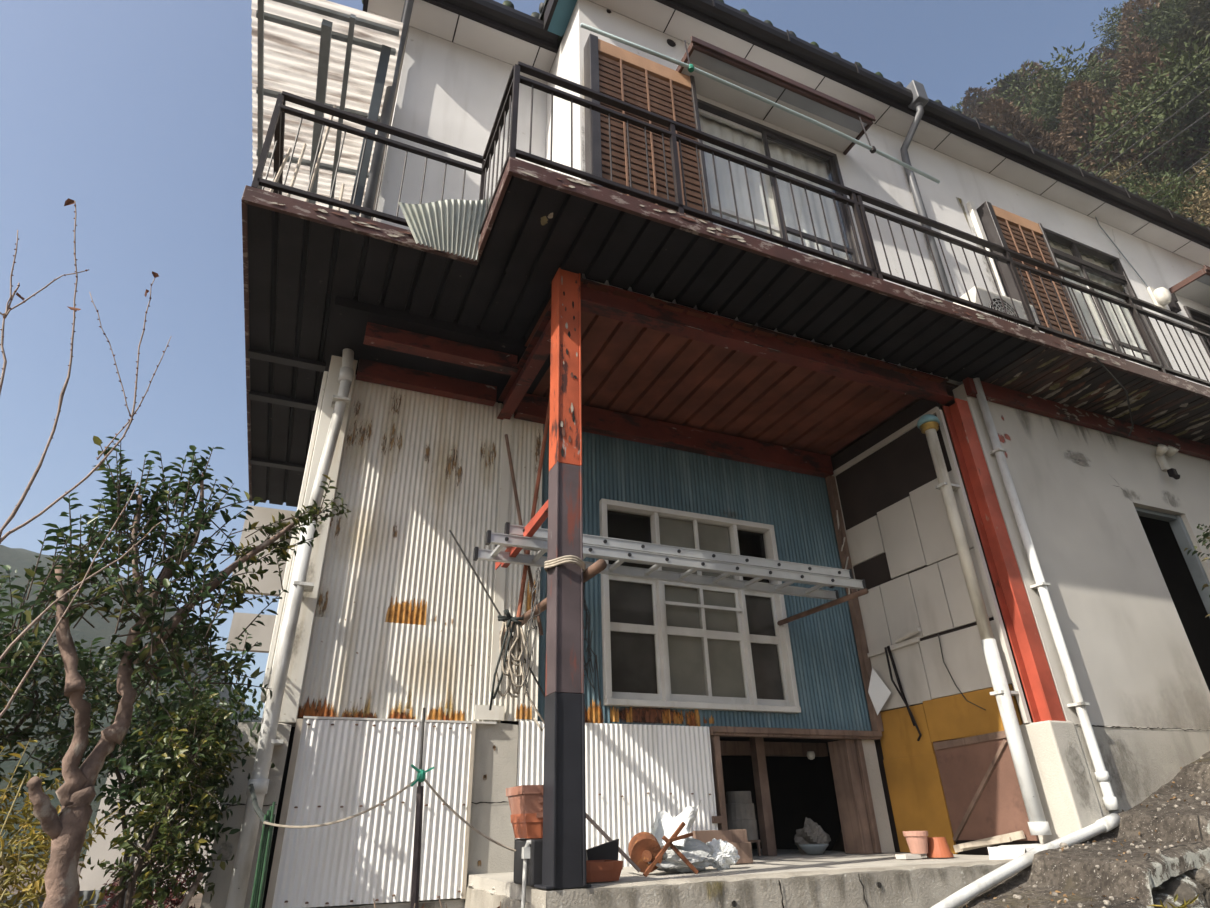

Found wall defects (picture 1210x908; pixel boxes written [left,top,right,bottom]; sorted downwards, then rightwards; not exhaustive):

corrosion [347,391,402,455]
corrosion [446,449,463,483]
corrosion [385,596,453,625]
corrosion [297,694,465,721]